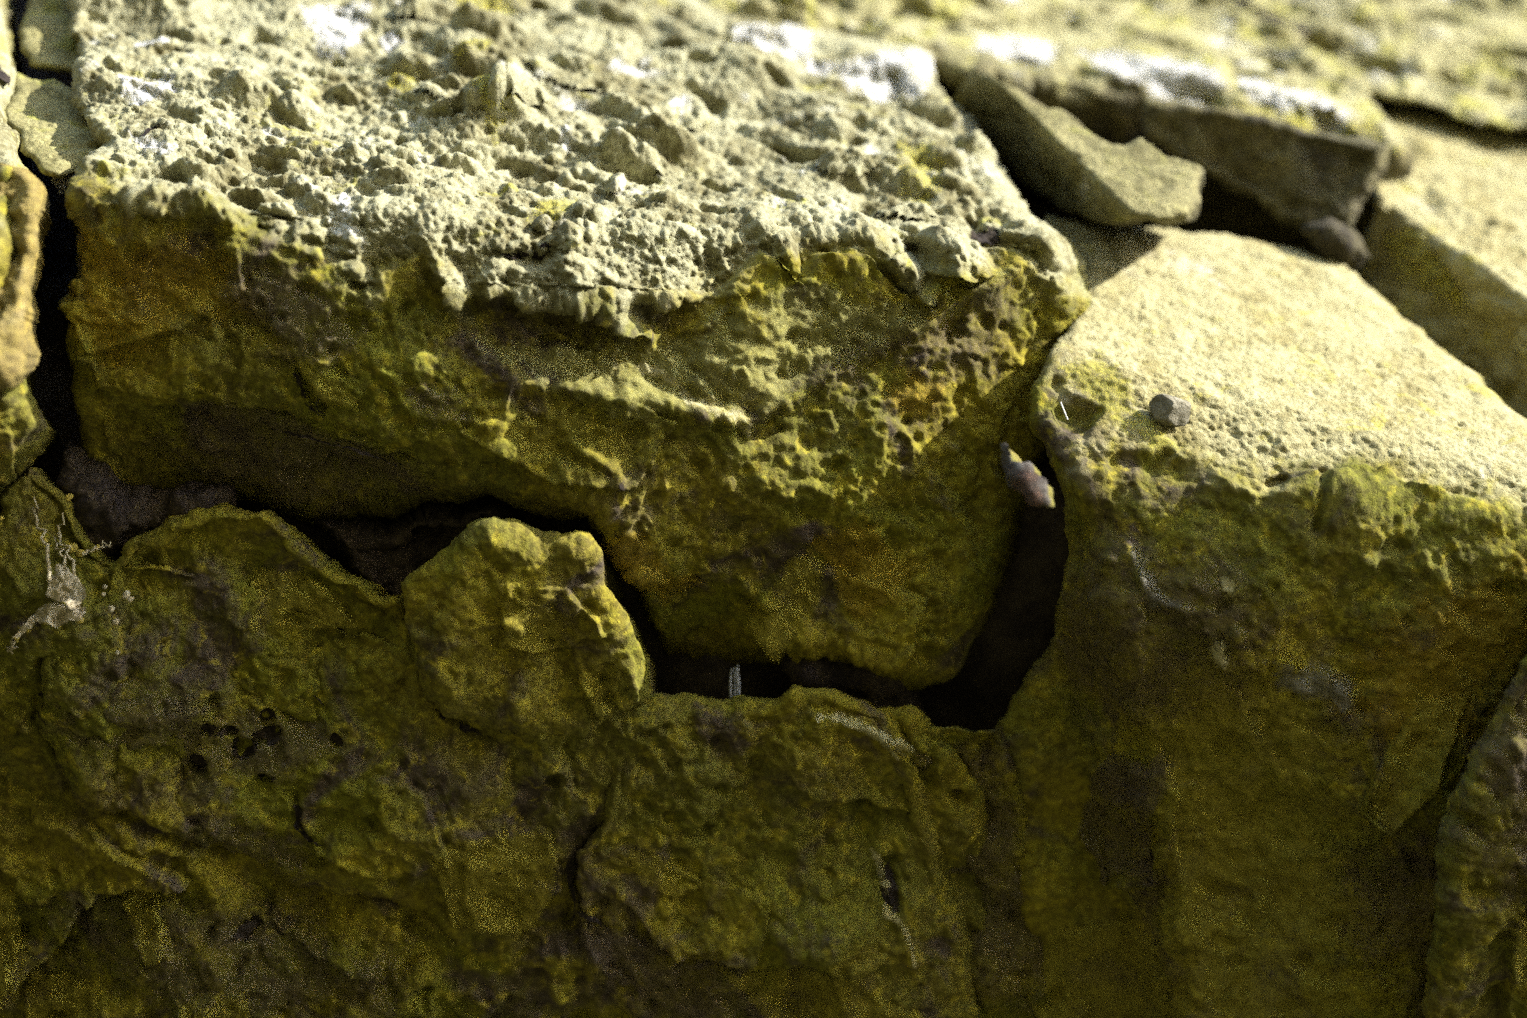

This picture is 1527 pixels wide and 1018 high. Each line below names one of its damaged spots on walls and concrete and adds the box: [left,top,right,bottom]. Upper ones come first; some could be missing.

crack [0,65,11,86]
crack [499,242,551,260]
crack [277,370,397,467]
crack [419,679,482,735]